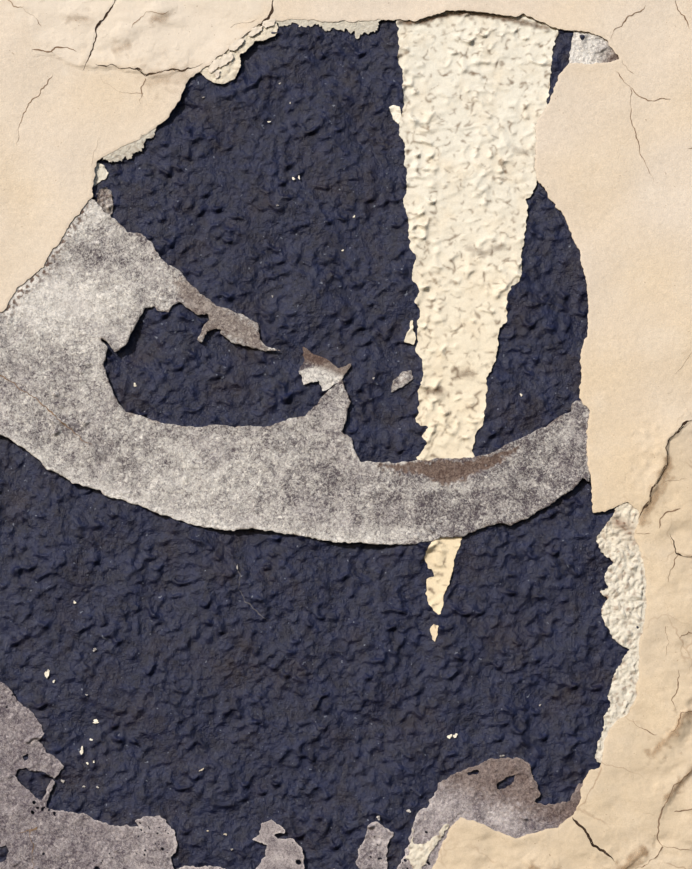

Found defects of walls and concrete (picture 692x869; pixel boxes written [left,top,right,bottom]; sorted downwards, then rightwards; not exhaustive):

crack [32,1,203,102]
crack [234,0,274,27]
crack [16,75,53,144]
crack [618,71,665,176]
peeling [0,10,619,545]
crack [637,420,692,581]
peeling [0,435,647,869]
crack [572,770,692,869]